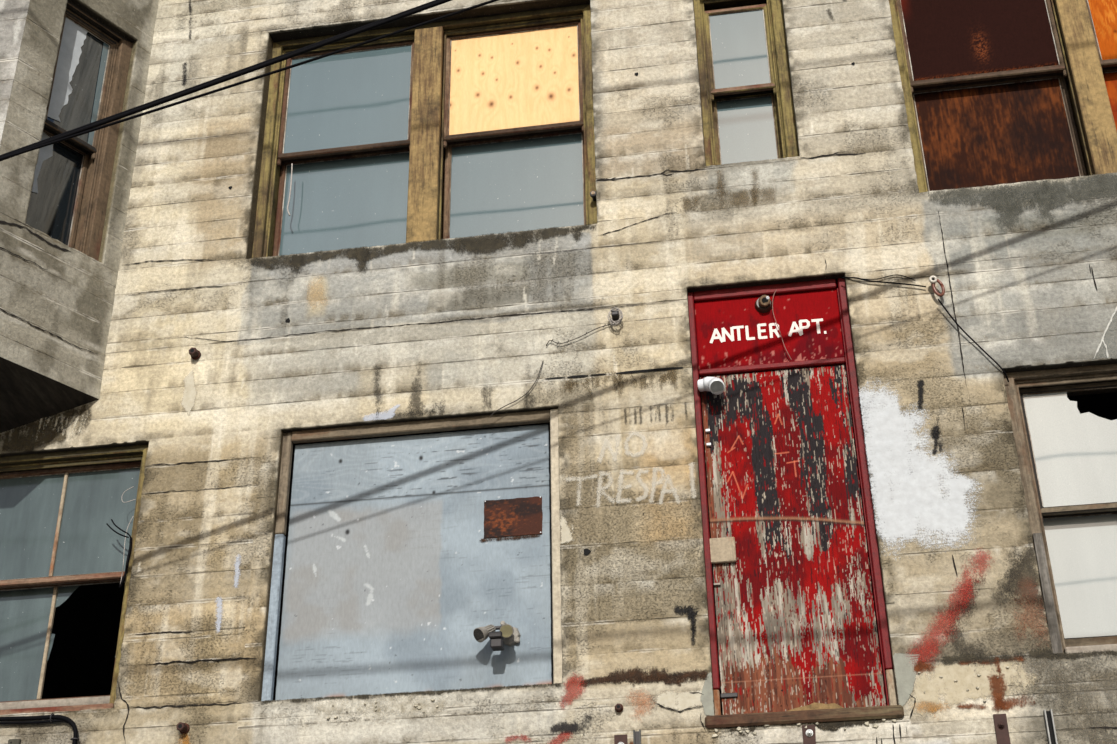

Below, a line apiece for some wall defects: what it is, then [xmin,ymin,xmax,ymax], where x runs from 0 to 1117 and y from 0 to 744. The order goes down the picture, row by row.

leakage [928,173,1117,230]
leakage [248,224,596,273]
crack [117,681,237,744]